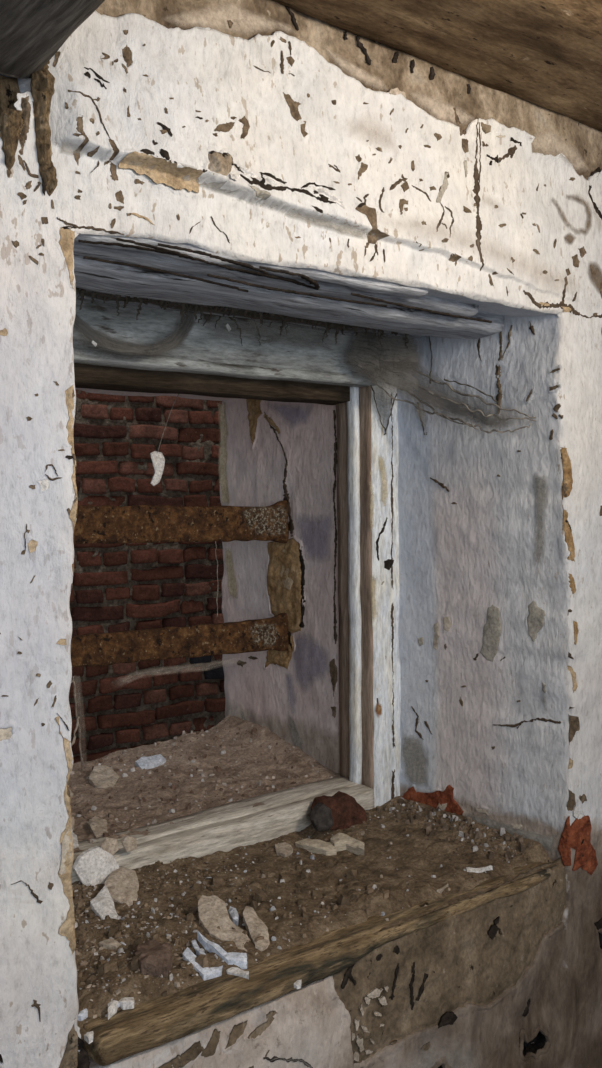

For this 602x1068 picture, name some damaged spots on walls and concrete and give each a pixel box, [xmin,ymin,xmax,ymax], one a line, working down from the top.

peeling [17,160,79,289]
flaking render [65,0,602,296]
crack [234,163,454,237]
crack [523,284,602,318]
spalling [548,365,577,596]
flaking render [236,534,306,670]
crack [493,718,561,729]
spalling [34,673,149,1068]
flaking render [173,895,276,981]
flaking render [323,782,598,1068]
flaking render [108,1008,279,1068]
crack [249,1050,313,1068]